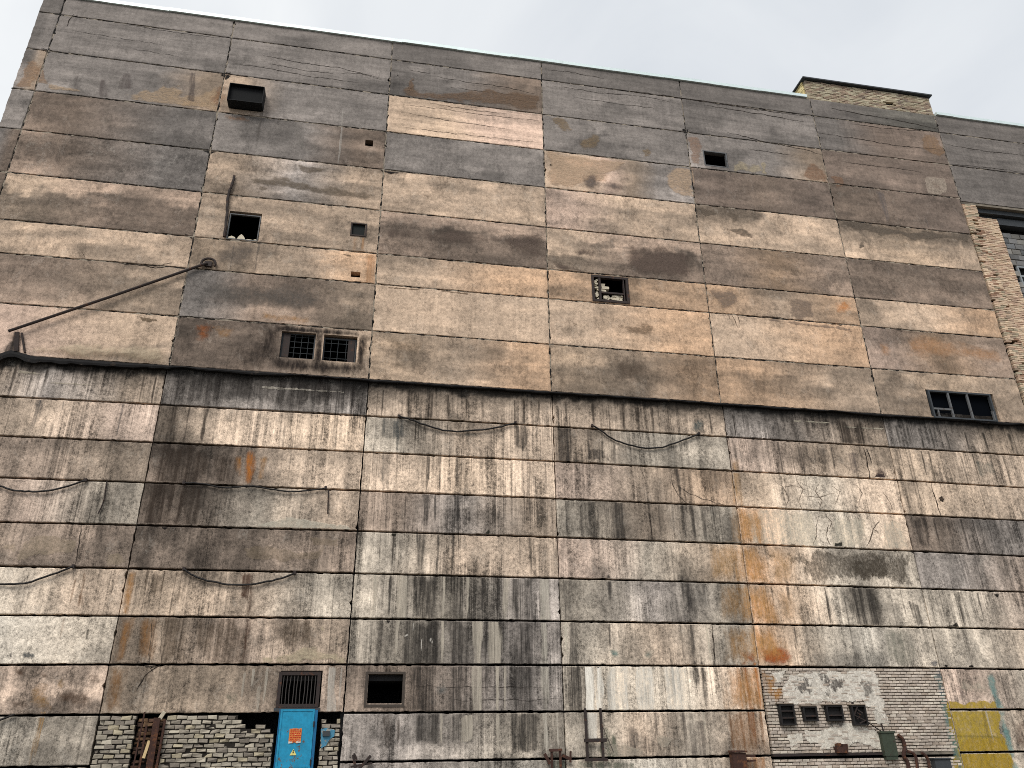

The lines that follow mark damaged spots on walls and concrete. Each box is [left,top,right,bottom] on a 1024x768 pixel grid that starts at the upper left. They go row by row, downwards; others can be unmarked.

crack [781,448,893,545]
water stain [752,513,908,625]
water stain [373,534,559,752]
rust [744,633,789,703]
peeling [771,670,889,749]